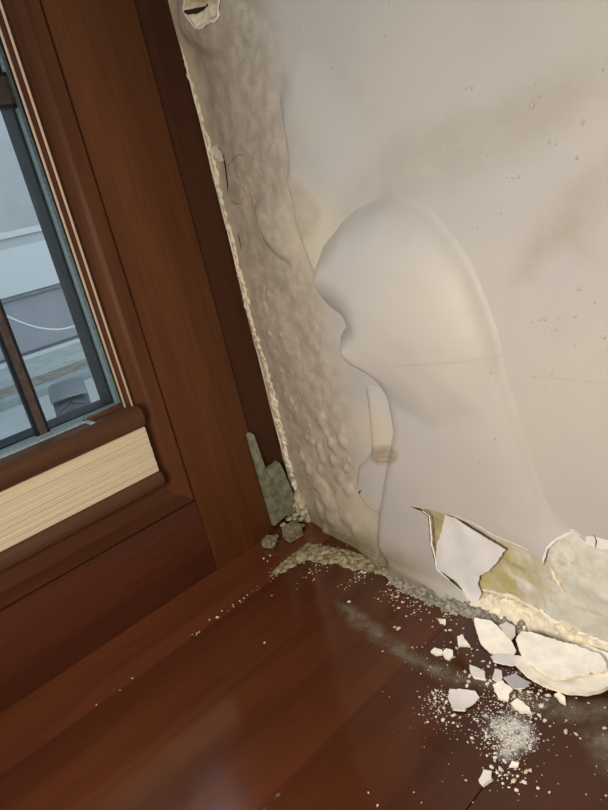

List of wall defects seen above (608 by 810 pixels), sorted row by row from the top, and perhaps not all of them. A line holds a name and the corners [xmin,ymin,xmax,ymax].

spalling [183,0,220,30]
spalling [180,44,359,538]
spalling [270,508,608,653]
peeling [431,634,471,661]
peeling [470,653,530,689]